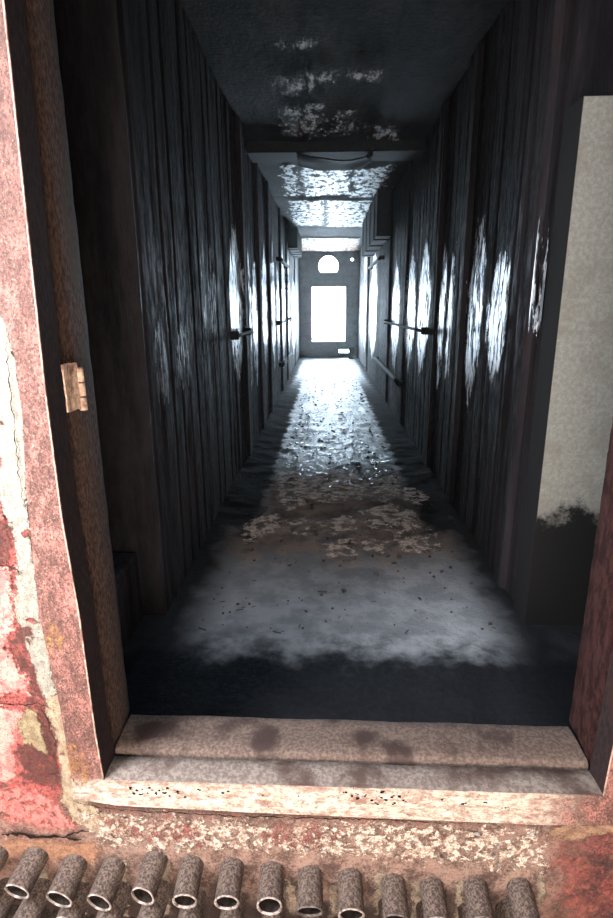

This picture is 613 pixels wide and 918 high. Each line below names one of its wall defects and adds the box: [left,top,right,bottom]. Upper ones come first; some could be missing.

crack [2,800,463,841]
peeling [0,309,613,918]